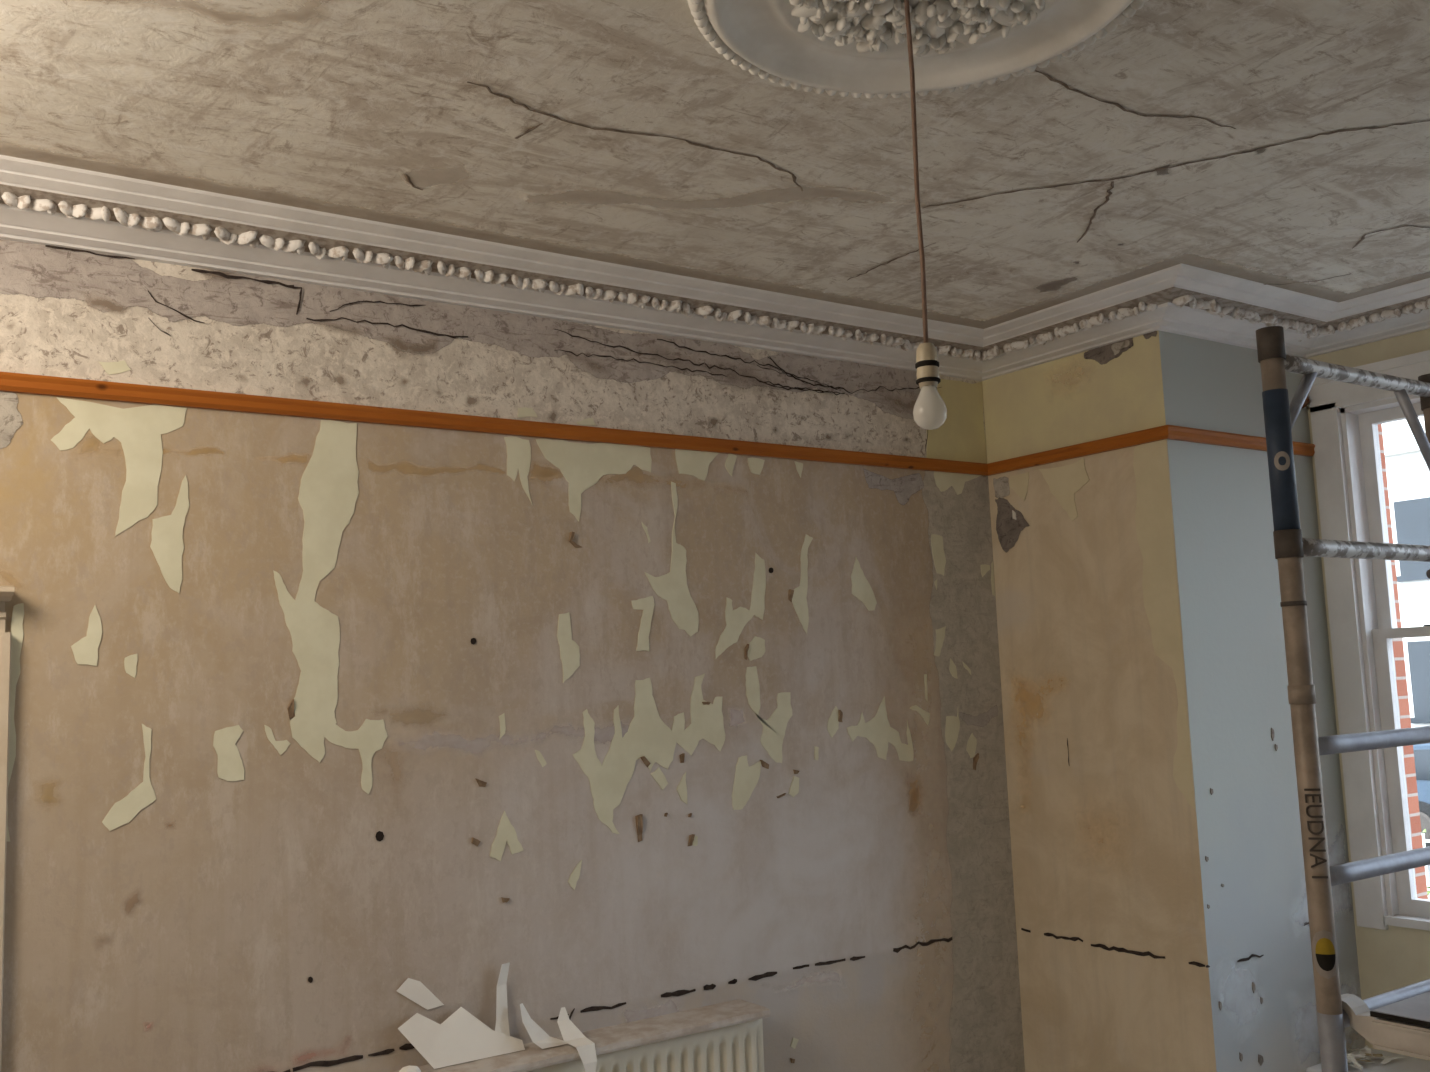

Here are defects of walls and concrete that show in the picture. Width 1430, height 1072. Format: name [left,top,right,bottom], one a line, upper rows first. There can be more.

crack [467,82,803,191]
crack [923,70,1430,243]
spalling [0,239,921,420]
peeling [51,397,189,593]
peeling [264,420,388,794]
peeling [504,436,652,521]
peeling [631,449,765,651]
peeling [1133,439,1213,812]
crack [284,1043,415,1072]
crack [550,1002,626,1020]
crack [661,937,953,997]
crack [1021,928,1264,968]